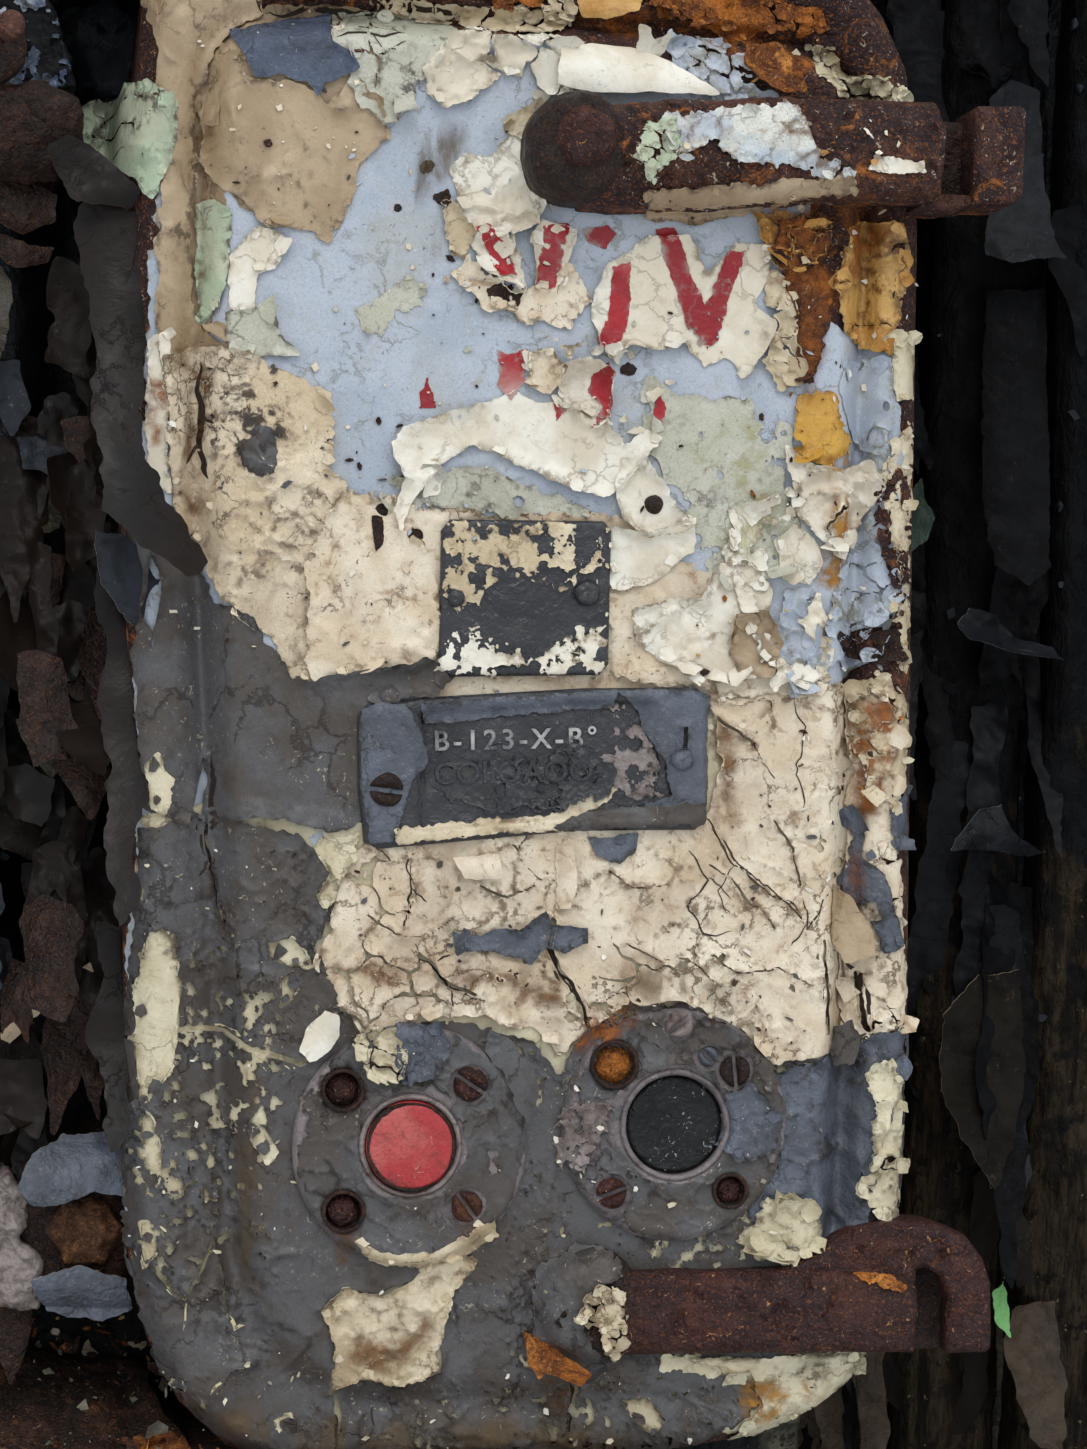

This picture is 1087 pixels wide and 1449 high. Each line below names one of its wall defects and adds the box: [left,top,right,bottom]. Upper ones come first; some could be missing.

rust [492,0,544,12]
rust [586,0,830,72]
peeling [864,128,927,174]
rust [771,210,892,384]
peeling [0,0,859,1188]
peeling [268,220,1044,1290]
crack [794,695,806,807]
crack [687,822,871,1030]
peeling [321,1220,499,1390]
peeling [523,1242,631,1391]
rust [853,1272,907,1293]
peeling [659,1352,908,1449]